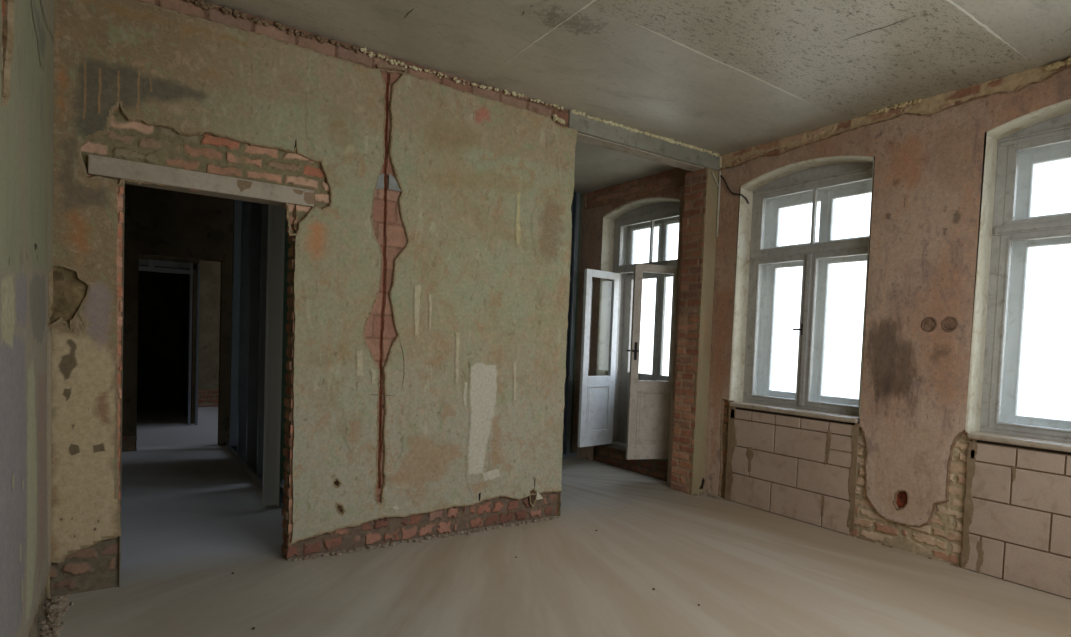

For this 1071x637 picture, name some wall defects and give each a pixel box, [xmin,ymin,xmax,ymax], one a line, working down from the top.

spalling [1,0,14,107]
spalling [29,263,90,351]
spalling [77,0,580,559]
flaking render [584,60,1071,498]
leakage [869,355,922,424]
spalling [28,364,120,637]
spalling [848,423,977,569]